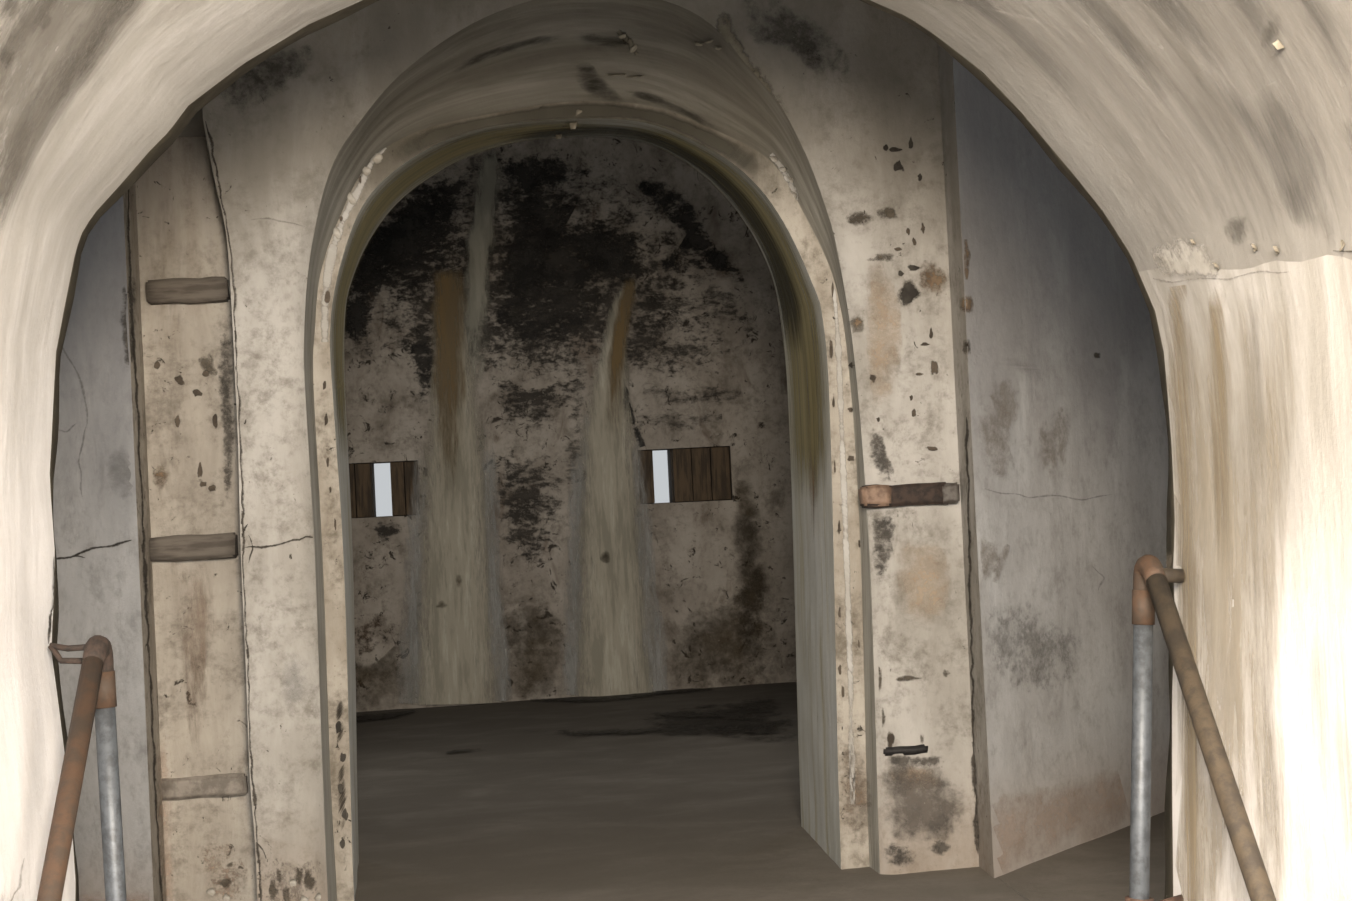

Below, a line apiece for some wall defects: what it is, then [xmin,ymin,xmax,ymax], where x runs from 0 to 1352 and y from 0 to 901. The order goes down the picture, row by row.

leakage [0,0,133,207]
leakage [408,67,751,167]
crack [48,190,163,901]
leakage [344,149,787,739]
leakage [887,756,958,865]